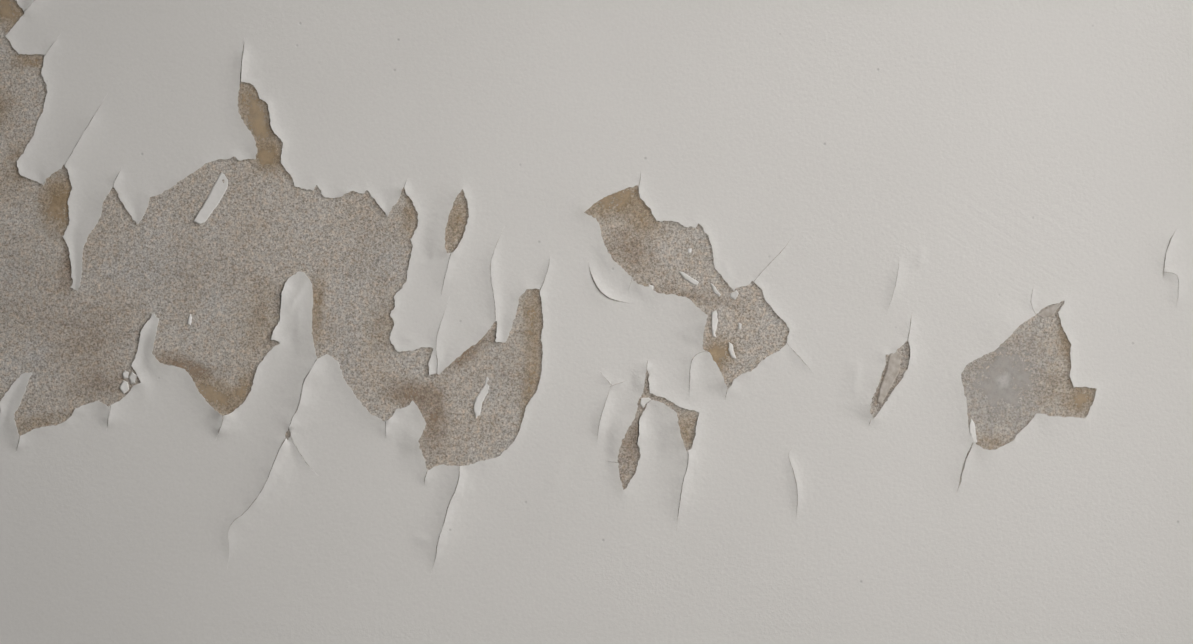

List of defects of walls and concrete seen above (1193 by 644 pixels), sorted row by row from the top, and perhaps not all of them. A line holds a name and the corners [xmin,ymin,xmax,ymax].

peeling [0,0,558,589]
peeling [571,161,822,542]
peeling [858,302,922,437]
peeling [946,273,1111,507]